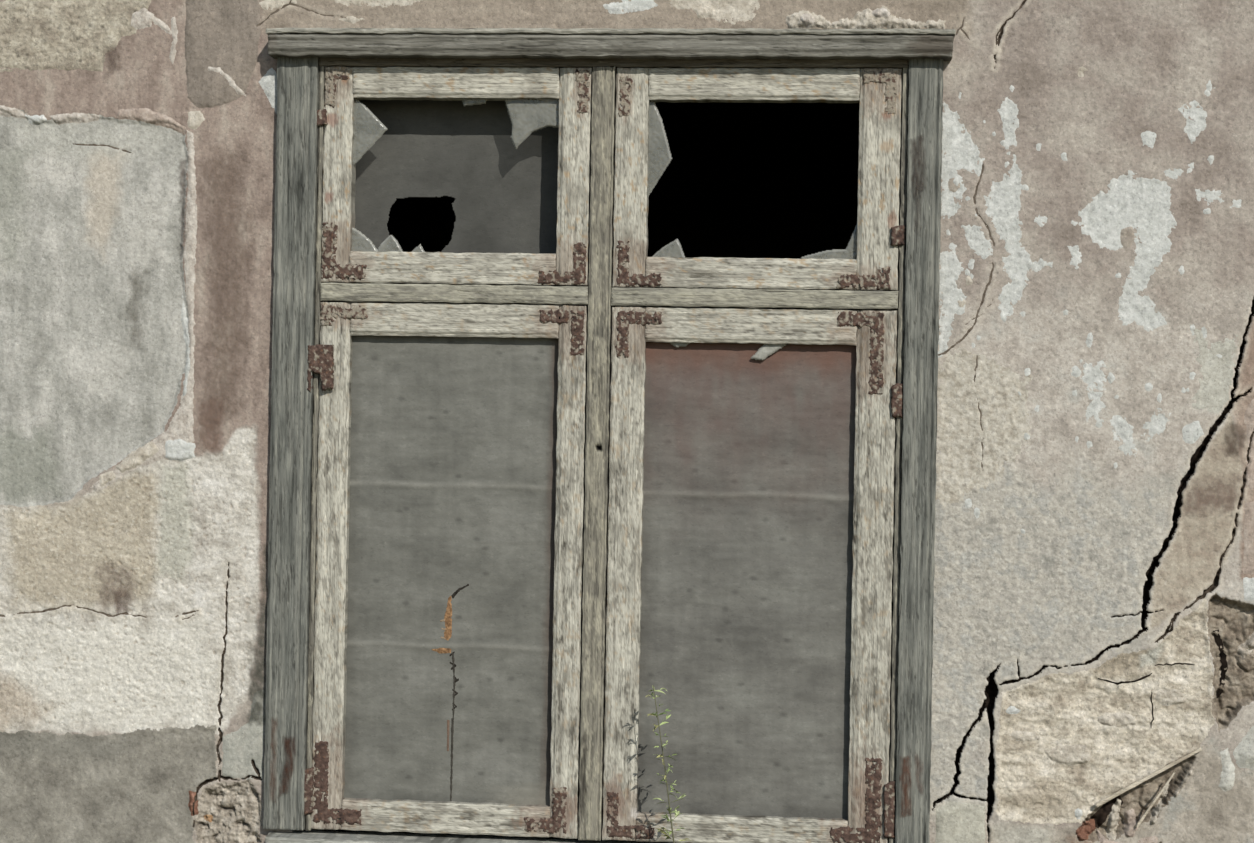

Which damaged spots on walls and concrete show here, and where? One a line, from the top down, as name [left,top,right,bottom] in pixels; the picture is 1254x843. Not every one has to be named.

peeling [0,0,297,508]
crack [938,164,995,471]
peeling [935,85,1053,518]
peeling [1071,333,1171,469]
peeling [1067,155,1214,332]
peeling [1178,80,1215,144]
peeling [1181,324,1239,444]
peeling [1195,189,1242,214]
crack [0,562,262,827]
spalling [188,780,264,843]
crack [932,297,1254,843]
spalling [935,399,1254,843]